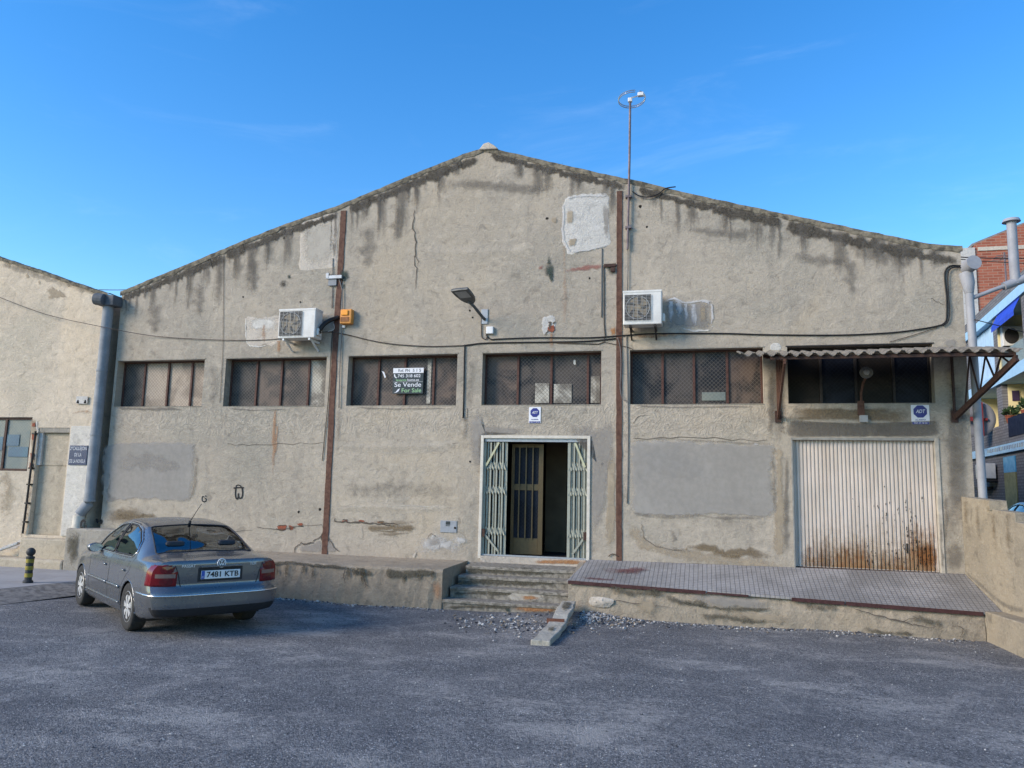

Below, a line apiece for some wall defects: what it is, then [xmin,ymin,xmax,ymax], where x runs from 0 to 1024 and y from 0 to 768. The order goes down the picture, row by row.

water stain [350,158,476,222]
water stain [491,153,621,198]
water stain [123,212,336,304]
crack [411,211,419,289]
water stain [639,187,956,267]
flaking render [542,315,556,335]
crack [235,519,398,587]
rust [804,525,937,571]